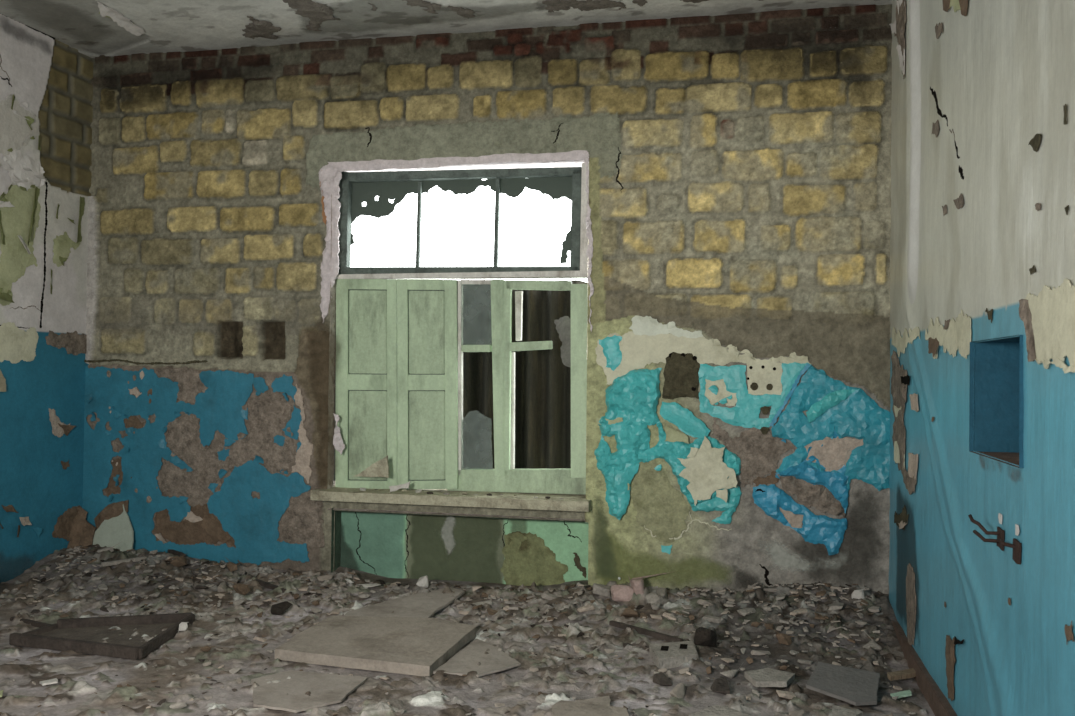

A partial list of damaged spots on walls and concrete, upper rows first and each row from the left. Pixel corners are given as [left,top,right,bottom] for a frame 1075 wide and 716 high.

spalling [283,0,340,31]
crack [0,55,12,87]
peeling [0,94,46,306]
crack [615,148,624,190]
crack [930,87,964,180]
peeling [1028,134,1042,152]
crack [0,182,48,328]
peeling [319,150,971,555]
peeling [1019,279,1075,373]
peeling [0,322,314,565]
crack [355,512,377,575]
crack [759,564,773,586]